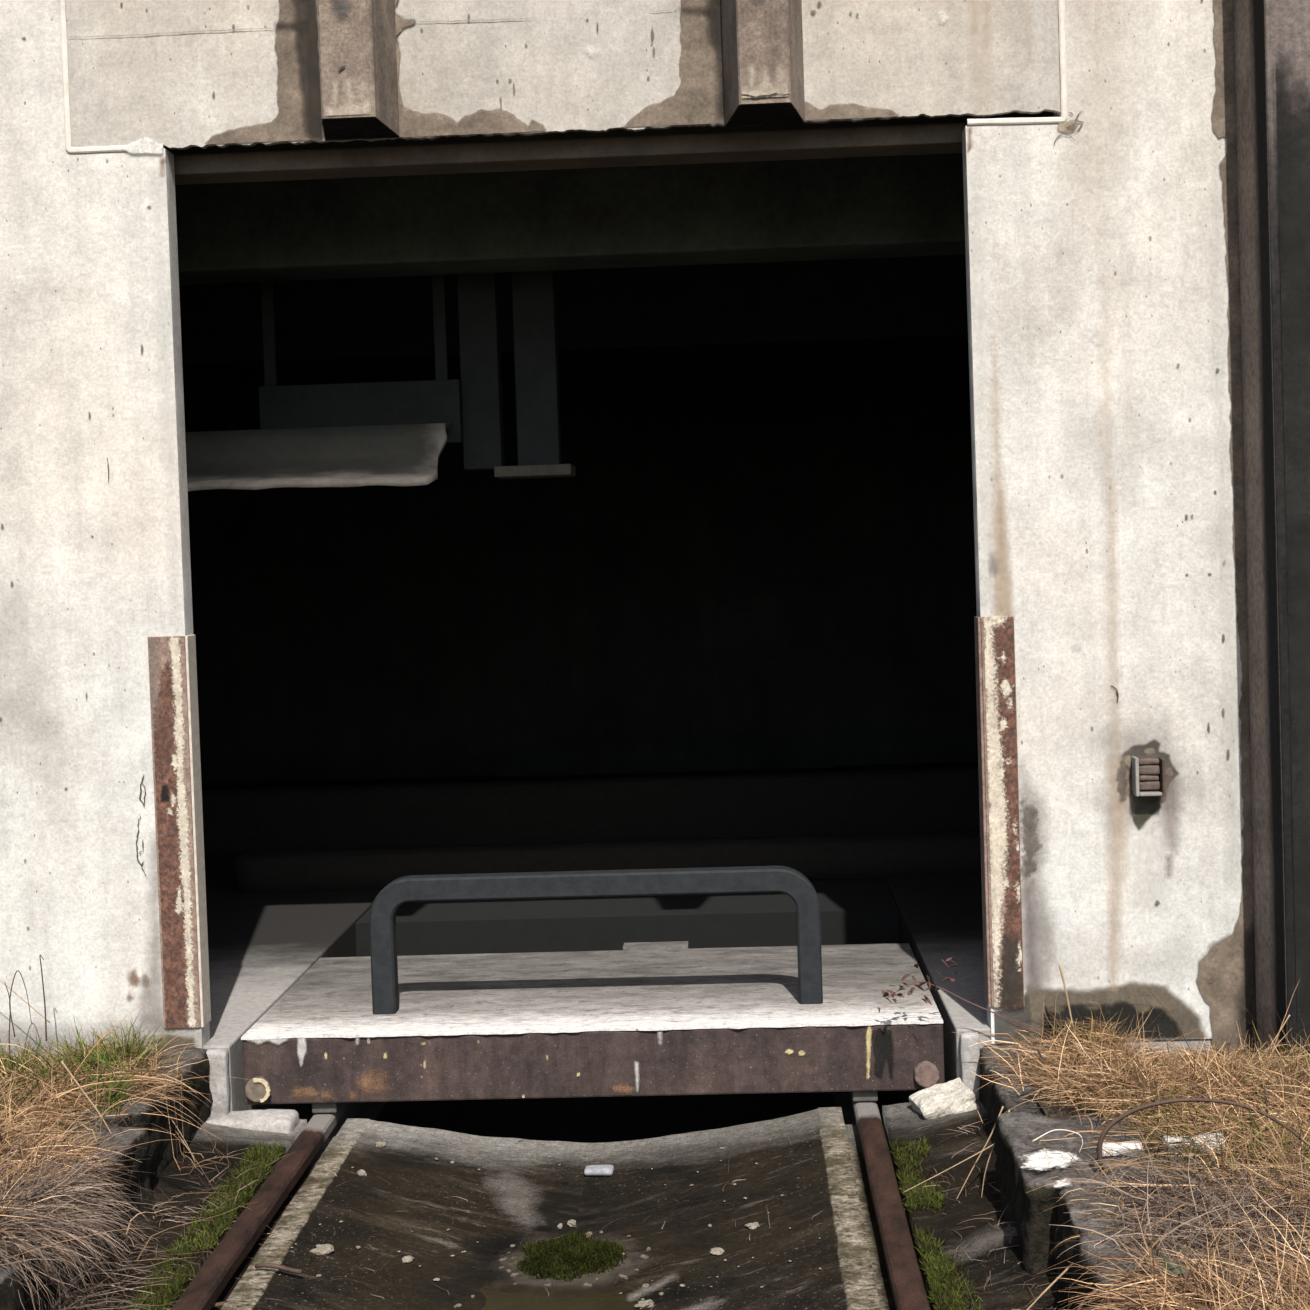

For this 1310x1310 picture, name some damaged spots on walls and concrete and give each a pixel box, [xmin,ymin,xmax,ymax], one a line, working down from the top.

damp [205,0,371,144]
damp [395,0,547,137]
damp [623,0,725,127]
damp [742,67,788,98]
damp [804,101,899,120]
damp [994,0,1257,1059]
crack [136,775,146,875]
corrosion [153,660,189,1031]
corrosion [992,617,1024,1010]
corrosion [128,972,147,999]
corrosion [294,1087,330,1098]
corrosion [350,1071,385,1098]